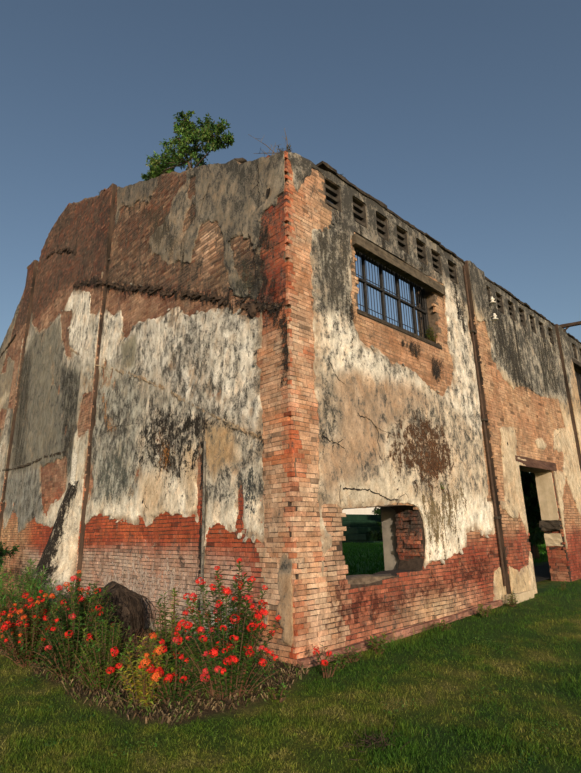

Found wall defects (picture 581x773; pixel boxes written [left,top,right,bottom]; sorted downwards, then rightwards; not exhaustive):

leakage [482,302,562,401]
leakage [131,401,204,501]
spalling [0,151,581,666]
crack [340,485,410,503]
leakage [325,403,495,638]